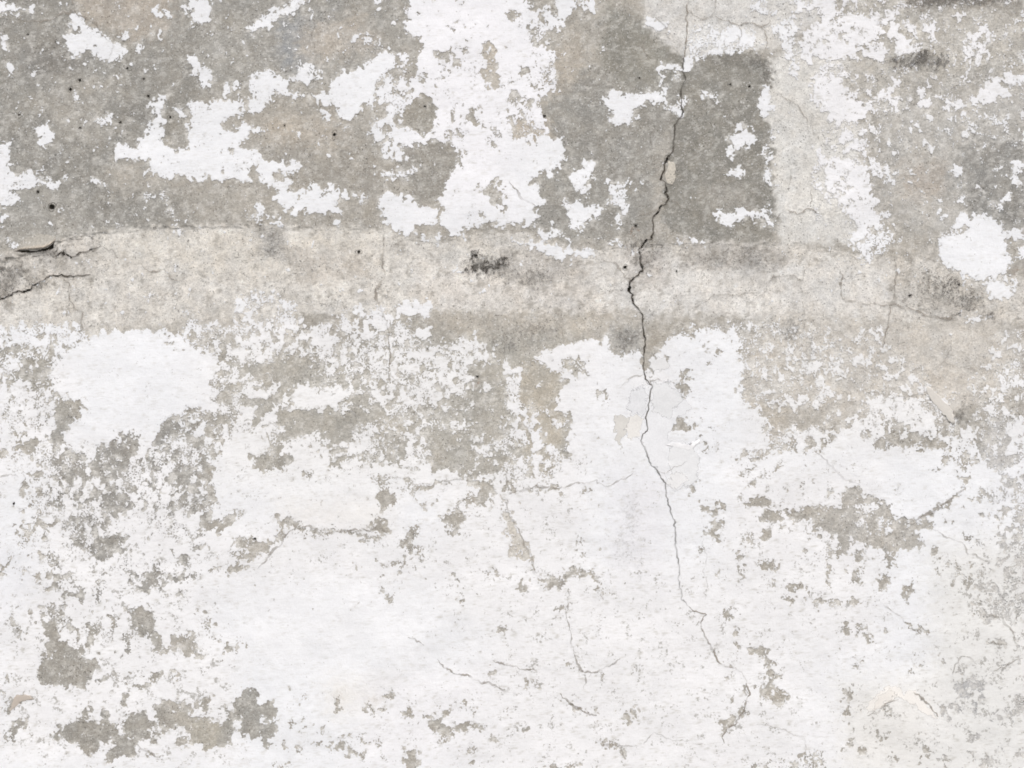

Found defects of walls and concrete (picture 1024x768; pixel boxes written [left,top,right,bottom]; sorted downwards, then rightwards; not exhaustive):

peeling [478,40,514,94]
crack [716,16,770,36]
crack [627,4,689,439]
crack [1,246,100,299]
peeling [371,524,437,605]
peeling [501,506,611,599]
peeling [735,462,962,597]
peeling [0,673,34,753]
peeling [49,686,303,768]
peeling [362,689,500,768]
crack [689,607,751,742]
peeling [714,606,791,738]